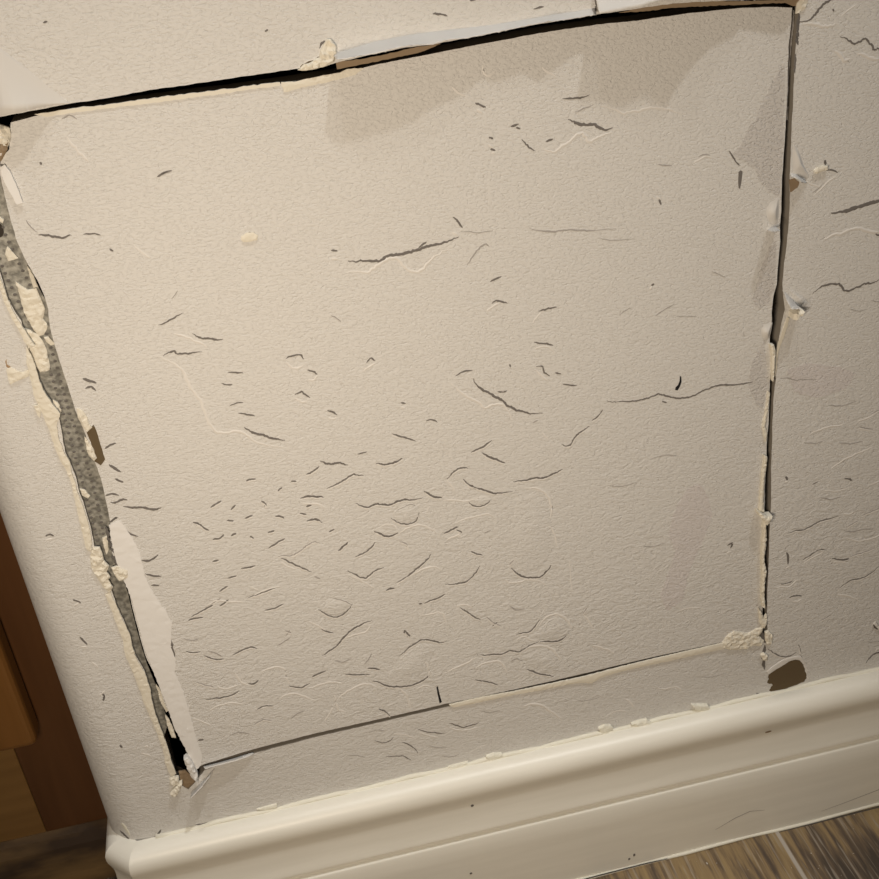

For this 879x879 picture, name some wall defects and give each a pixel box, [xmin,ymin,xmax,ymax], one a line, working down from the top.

peeling [333,0,661,60]
crack [793,0,831,73]
crack [841,37,879,62]
peeling [0,48,69,116]
crack [831,199,879,214]
crack [348,217,490,265]
crack [813,280,879,311]
crack [163,333,223,356]
crack [221,372,285,441]
crack [456,370,539,423]
crack [561,377,816,449]
crack [171,434,566,690]